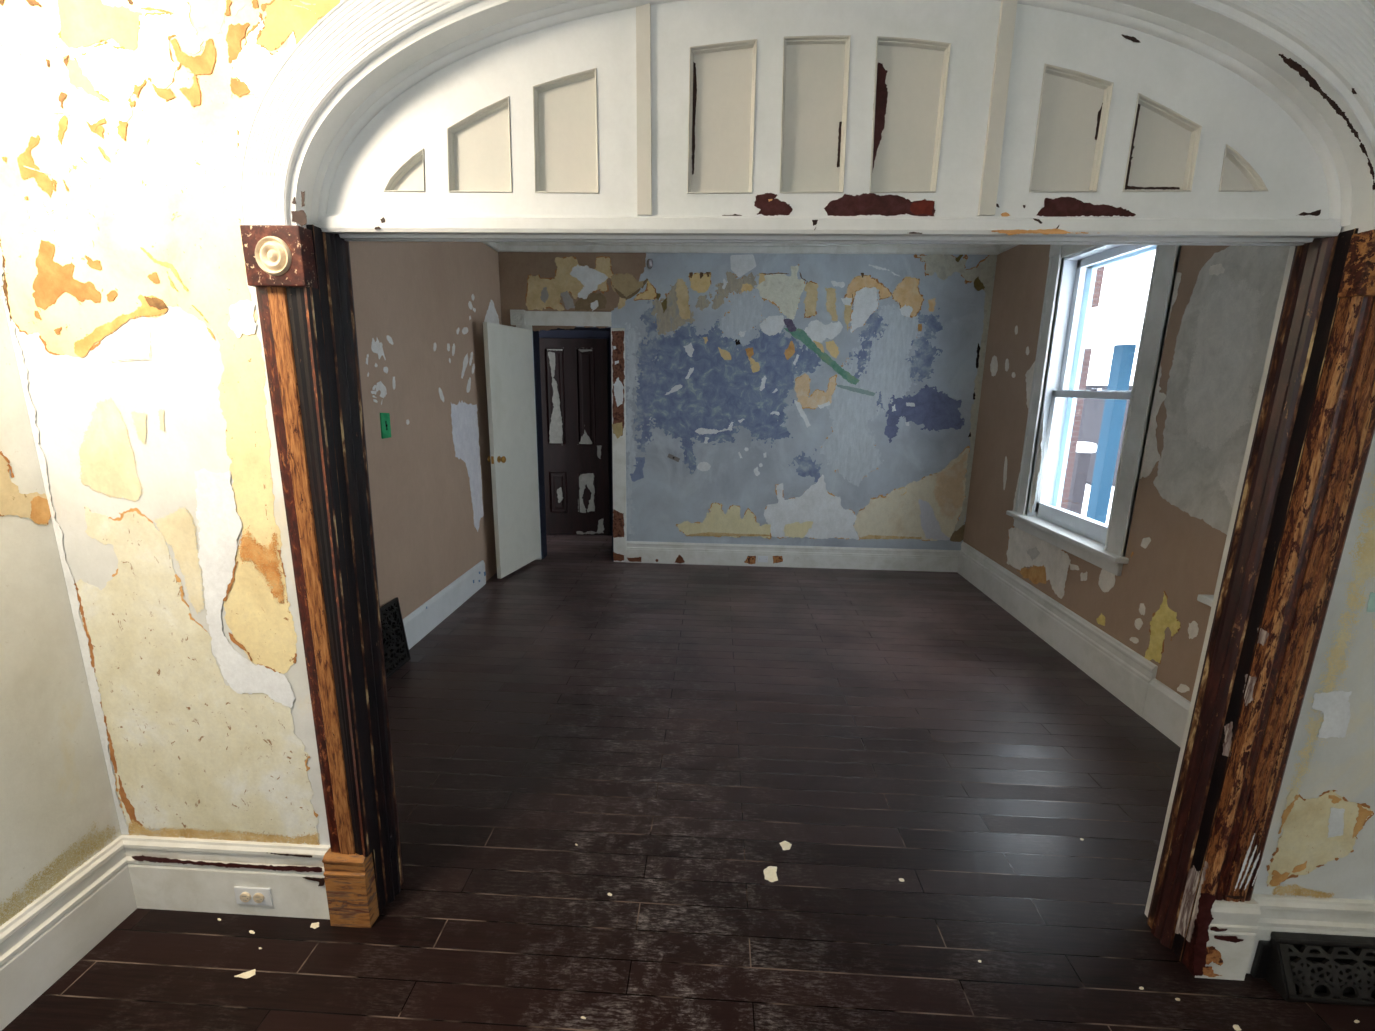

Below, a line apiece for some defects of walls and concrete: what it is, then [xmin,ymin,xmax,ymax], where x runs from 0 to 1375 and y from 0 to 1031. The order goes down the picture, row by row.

peeling [58,0,343,141]
spalling [1279,54,1375,190]
spalling [291,191,307,226]
spalling [722,193,793,216]
spalling [812,193,936,234]
spalling [612,330,625,439]
peeling [760,287,970,541]
peeling [547,348,658,562]
peeling [1006,527,1071,599]
peeling [1144,591,1181,664]
spalling [132,853,325,886]
spalling [1210,926,1243,943]